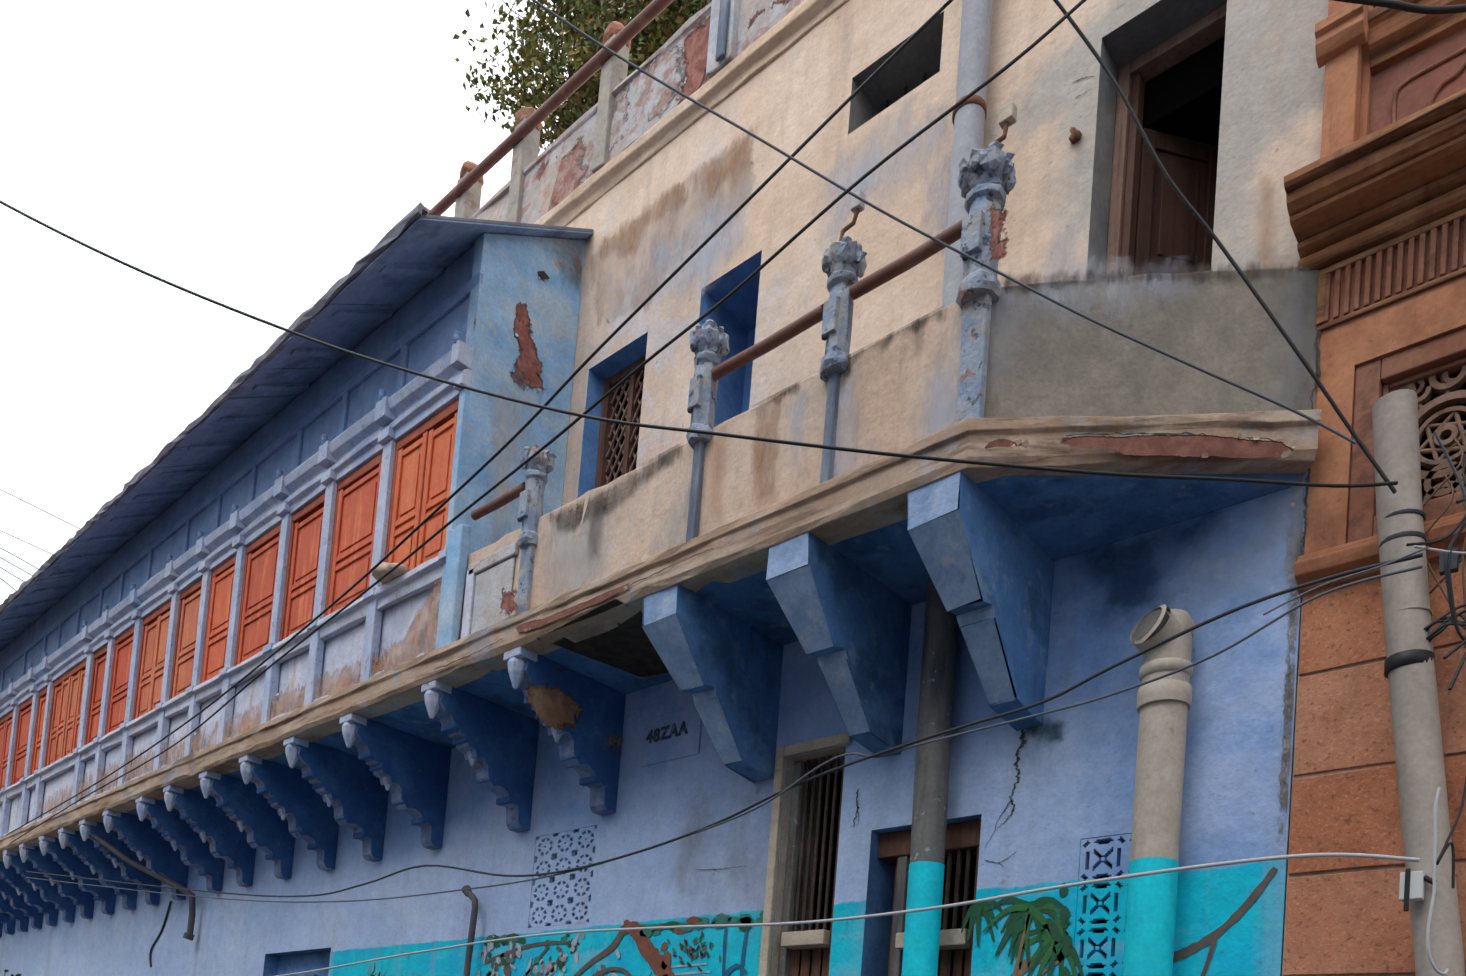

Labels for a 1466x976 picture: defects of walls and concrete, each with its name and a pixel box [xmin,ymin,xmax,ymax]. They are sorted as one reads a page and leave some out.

peeling [748,0,790,28]
peeling [609,16,711,151]
peeling [536,137,591,212]
peeling [987,204,1009,262]
water stain [1004,270,1152,301]
peeling [510,303,544,391]
peeling [1061,434,1295,459]
spalling [526,682,583,730]
crack [984,729,1027,866]